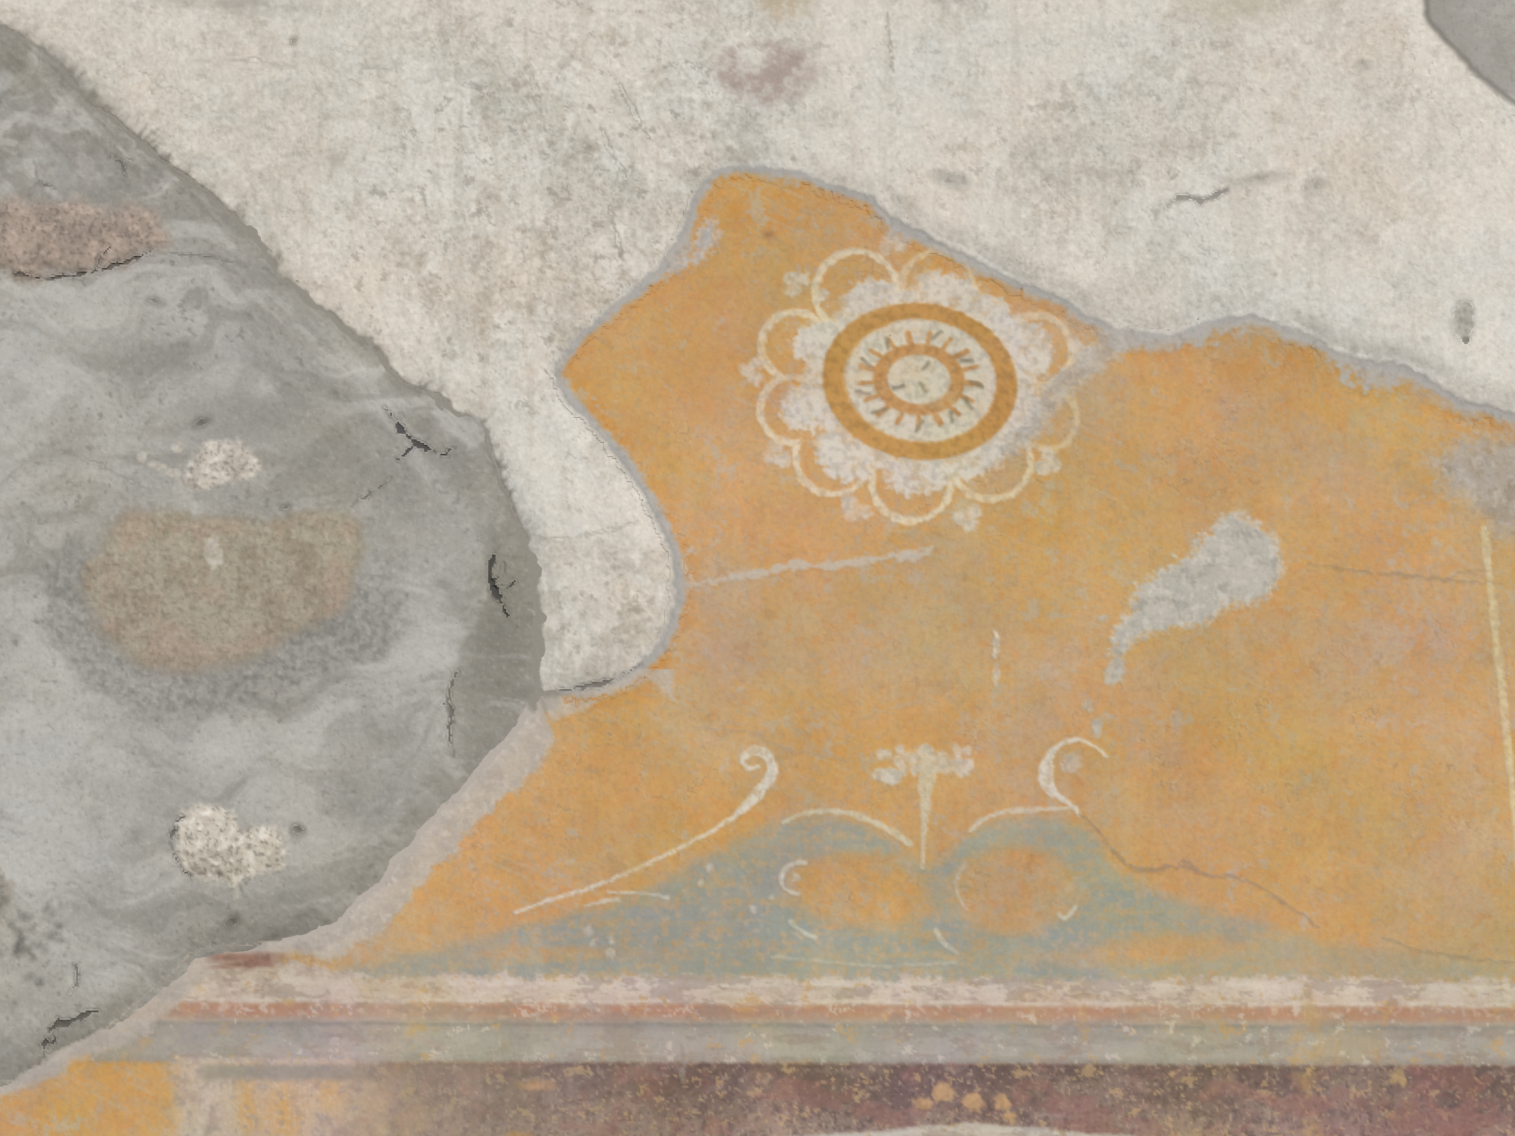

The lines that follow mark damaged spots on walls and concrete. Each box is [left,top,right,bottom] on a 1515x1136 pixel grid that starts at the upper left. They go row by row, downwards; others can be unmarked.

spalling [924,164,975,192]
spalling [1217,165,1296,190]
flaking render [0,185,178,291]
peeling [662,209,729,284]
spalling [1445,291,1482,349]
peeling [993,315,1151,463]
crack [348,404,459,510]
flaking render [74,435,375,685]
crack [484,517,641,622]
peeling [1078,506,1292,742]
spalling [0,669,679,1105]
crack [1076,811,1322,929]